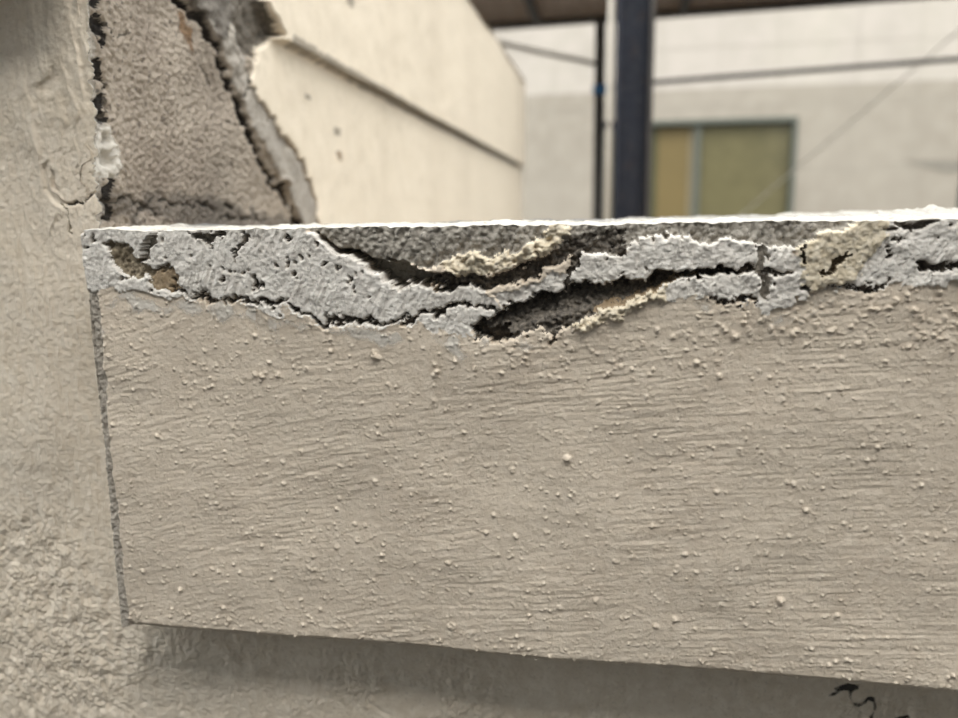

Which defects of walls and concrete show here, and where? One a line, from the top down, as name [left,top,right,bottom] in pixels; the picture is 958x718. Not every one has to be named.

crack [60,0,301,234]
spalling [79,0,958,344]
crack [172,277,513,342]